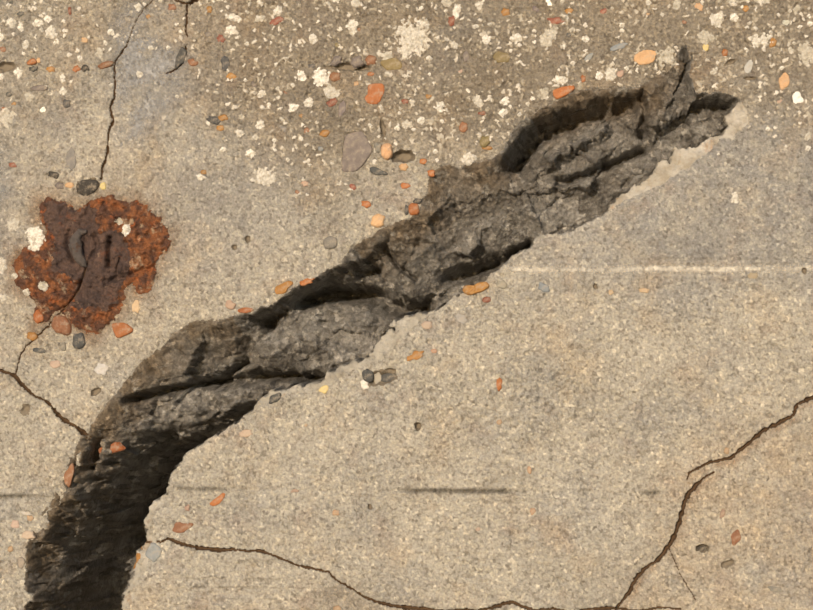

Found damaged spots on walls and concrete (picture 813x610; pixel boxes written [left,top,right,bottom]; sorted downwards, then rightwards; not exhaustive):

crack [100,0,153,180]
crack [166,0,199,74]
spalling [324,62,373,72]
crack [0,269,92,439]
rust [11,195,172,336]
spalling [156,72,748,469]
spalling [122,542,151,610]
crack [146,395,813,610]